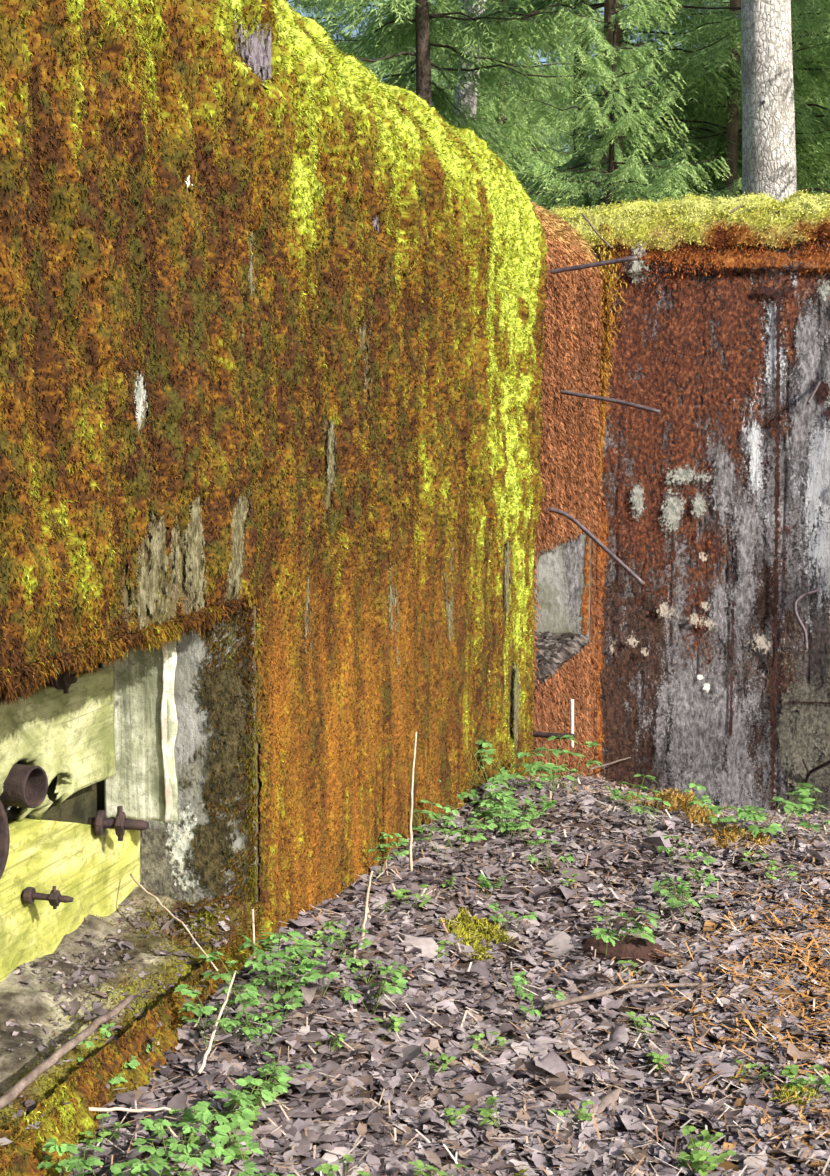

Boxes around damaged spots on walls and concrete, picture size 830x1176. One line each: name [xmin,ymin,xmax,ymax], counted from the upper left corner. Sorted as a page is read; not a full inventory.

damp [560,535,585,634]
rust [580,241,830,806]
damp [599,261,830,817]